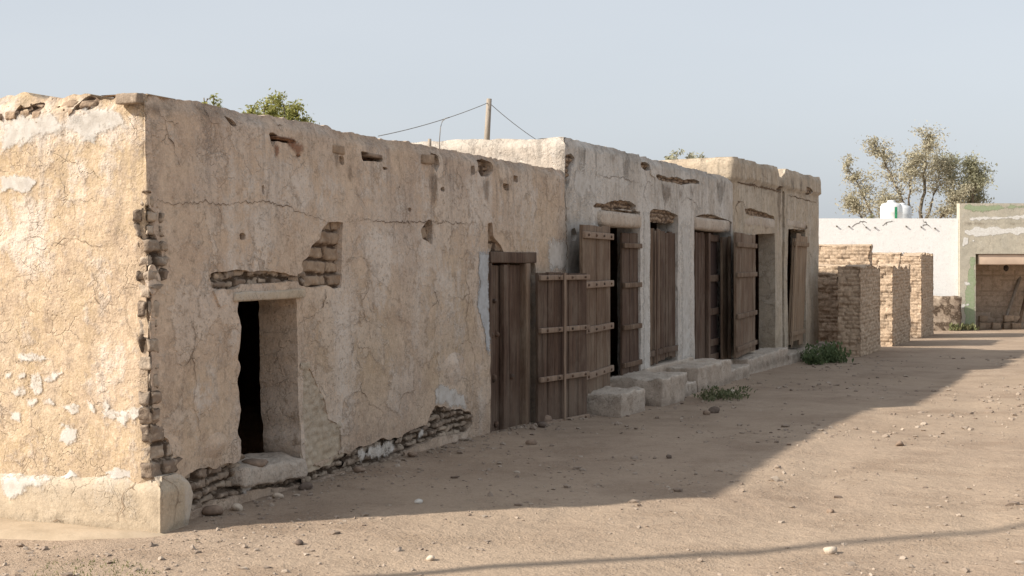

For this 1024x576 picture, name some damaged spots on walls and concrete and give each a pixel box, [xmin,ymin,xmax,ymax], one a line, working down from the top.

crack [157,167,486,243]
flaking render [593,201,631,213]
flaking render [288,222,340,288]
spalling [6,189,183,483]